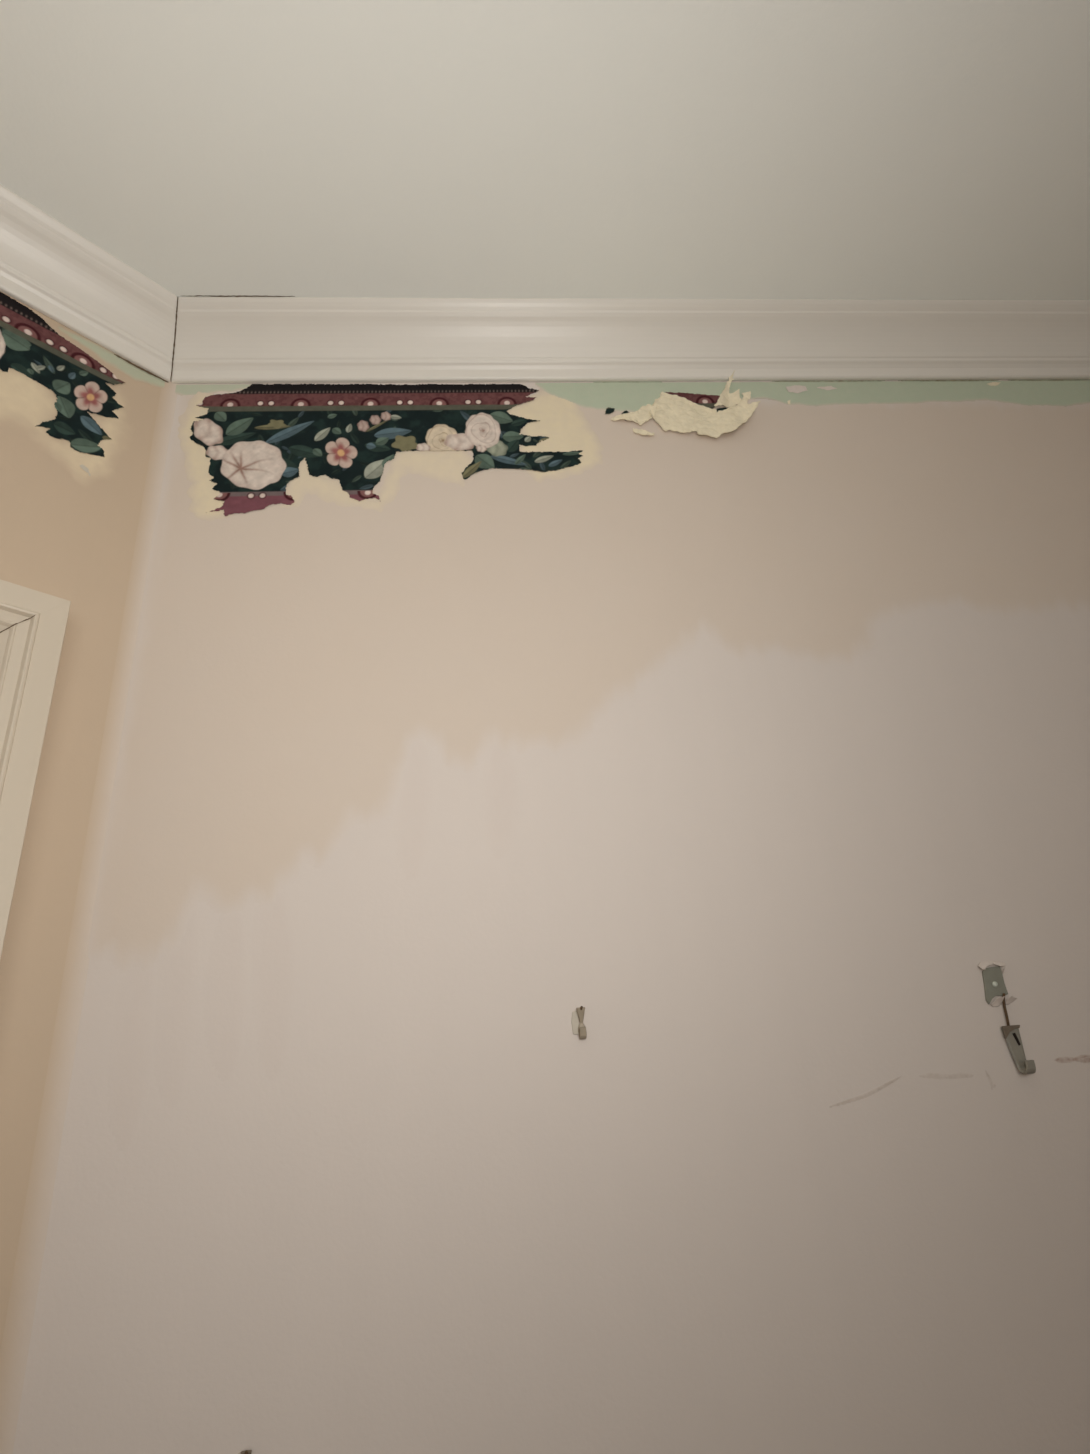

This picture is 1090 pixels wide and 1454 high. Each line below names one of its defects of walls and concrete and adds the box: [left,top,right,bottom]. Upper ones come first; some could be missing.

peeling [535,380,1090,412]